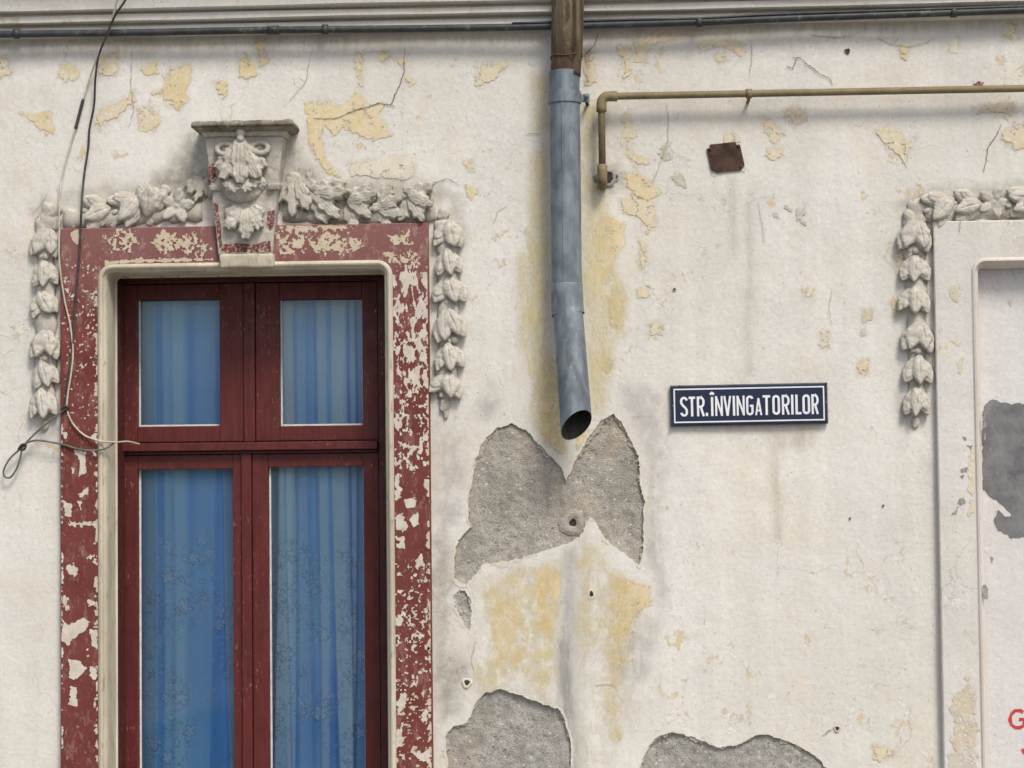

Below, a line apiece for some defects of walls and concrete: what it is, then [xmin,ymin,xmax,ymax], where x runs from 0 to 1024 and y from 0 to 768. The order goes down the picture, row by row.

peeling [95,61,192,132]
crack [313,48,405,120]
peeling [304,51,416,180]
crack [787,32,933,85]
spalling [275,225,364,258]
peeling [592,113,674,328]
spalling [61,228,213,762]
flaking render [383,230,575,768]
flaking render [451,388,649,631]
peeling [951,399,1024,539]
flaking render [639,731,828,768]
peeling [947,676,981,768]